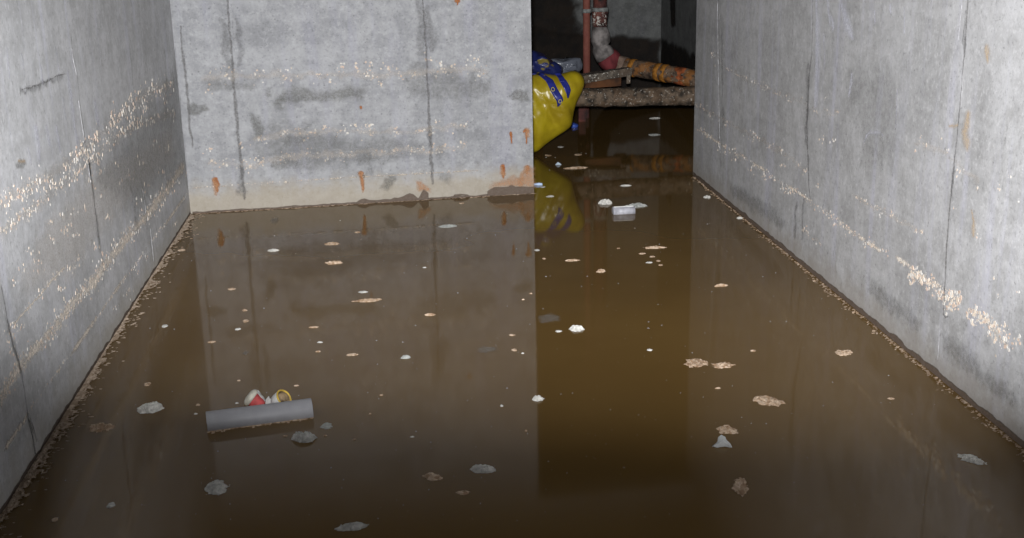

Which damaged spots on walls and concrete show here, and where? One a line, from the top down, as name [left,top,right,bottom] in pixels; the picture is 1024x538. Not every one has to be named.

crack [228,2,245,198]
corrosion [499,164,532,186]
water stain [697,129,938,286]
water stain [693,172,1024,448]